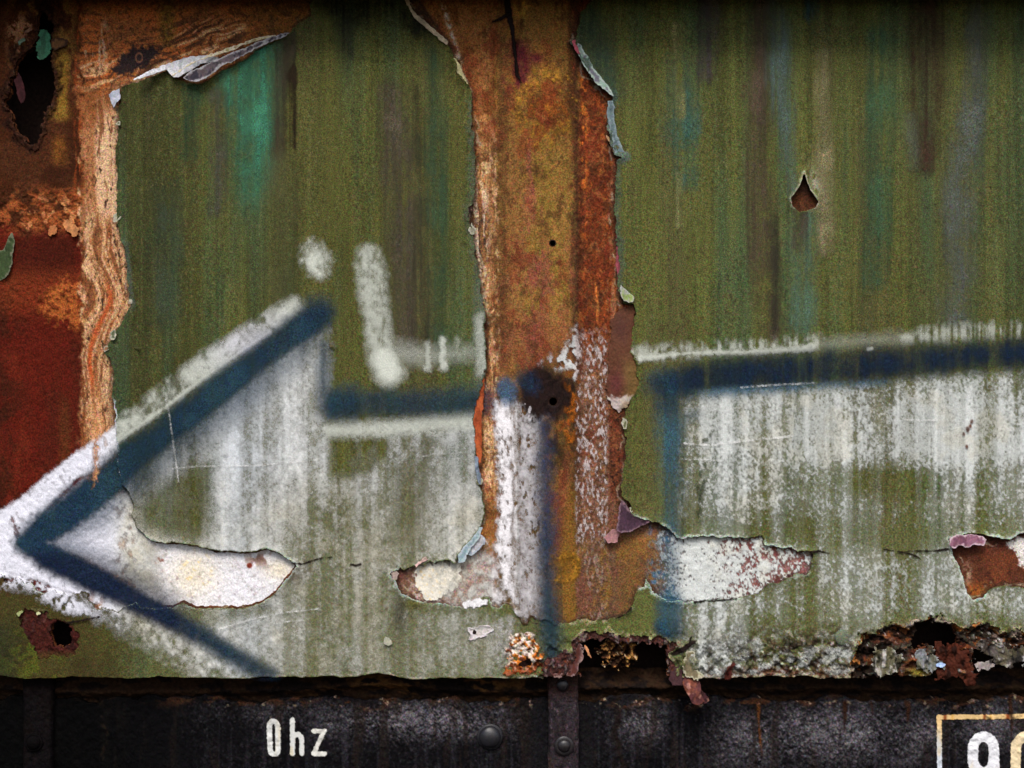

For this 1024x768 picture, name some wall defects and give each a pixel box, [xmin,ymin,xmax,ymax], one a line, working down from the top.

peeling [0,0,312,537]
peeling [390,0,813,625]
corrosion [521,366,576,454]
peeling [4,576,51,593]
peeling [107,489,297,609]
peeling [553,643,591,678]
peeling [669,651,709,705]